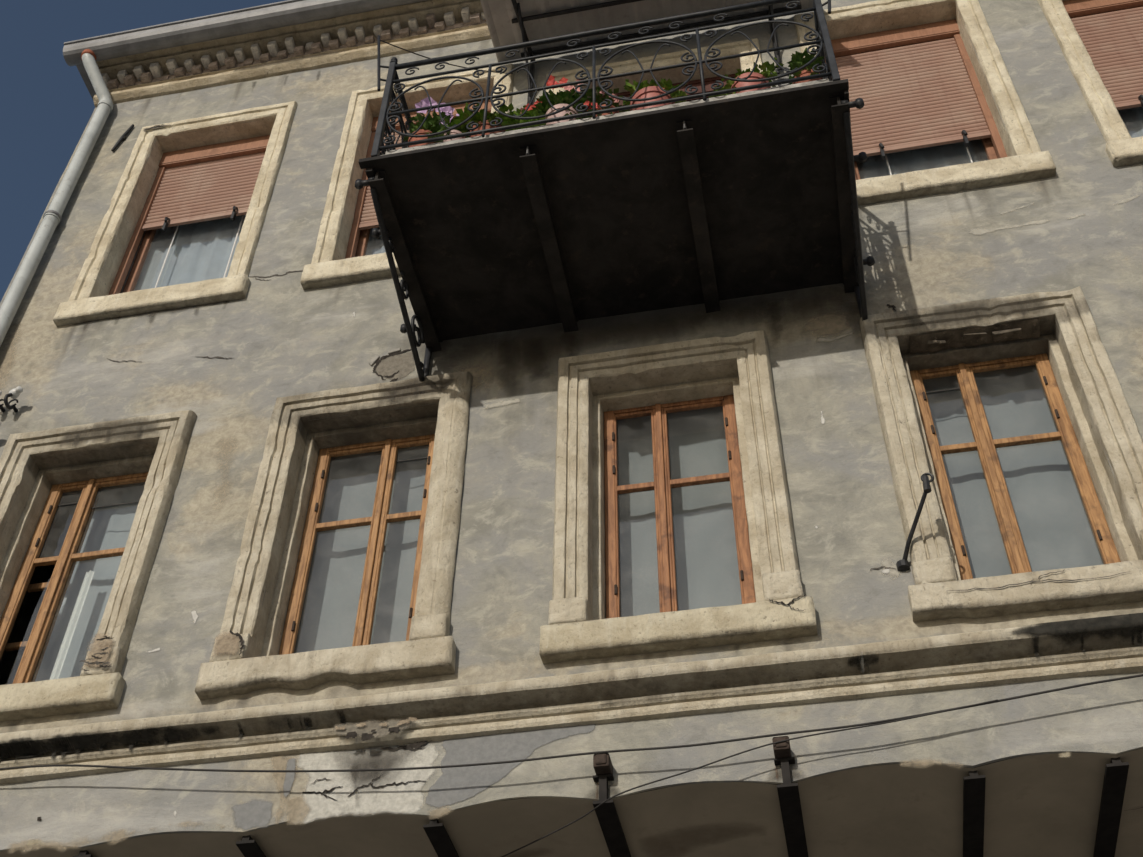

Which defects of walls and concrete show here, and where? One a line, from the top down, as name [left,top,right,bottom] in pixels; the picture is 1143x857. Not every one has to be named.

crack [249,270,303,281]
crack [769,594,806,611]
spalling [80,634,113,671]
spalling [214,630,244,655]
water stain [1012,613,1143,656]
water stain [0,727,219,761]
crack [382,740,432,751]
peeling [273,717,449,823]
crack [302,777,426,801]